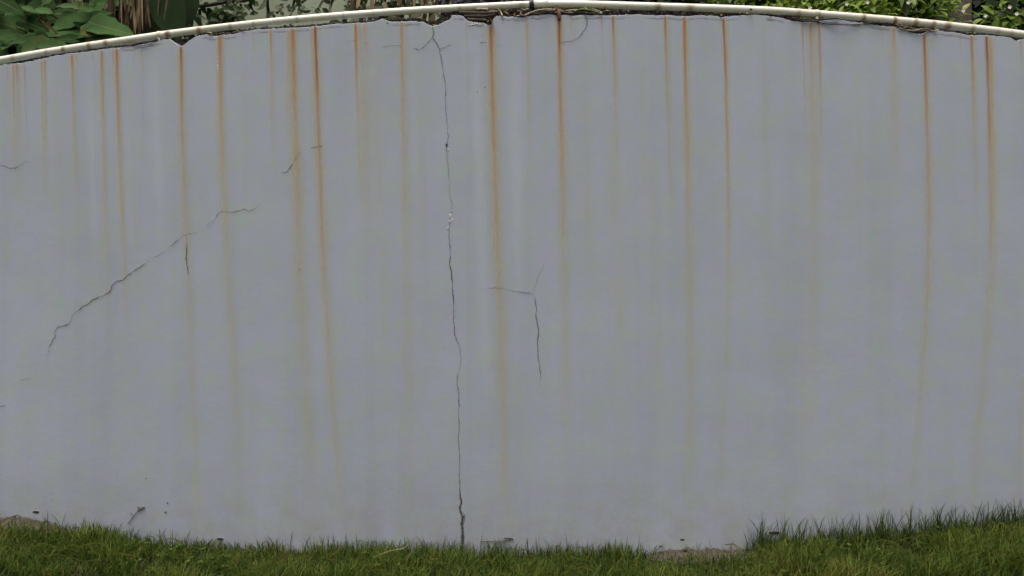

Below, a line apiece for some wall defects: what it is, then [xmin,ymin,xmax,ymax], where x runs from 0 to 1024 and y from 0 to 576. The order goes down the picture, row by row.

corrosion [288,28,297,121]
corrosion [312,26,323,241]
crack [384,27,461,370]
corrosion [488,25,498,241]
corrosion [683,9,691,155]
corrosion [914,19,950,115]
crack [49,205,259,347]
crack [487,288,541,386]
crack [457,399,465,553]